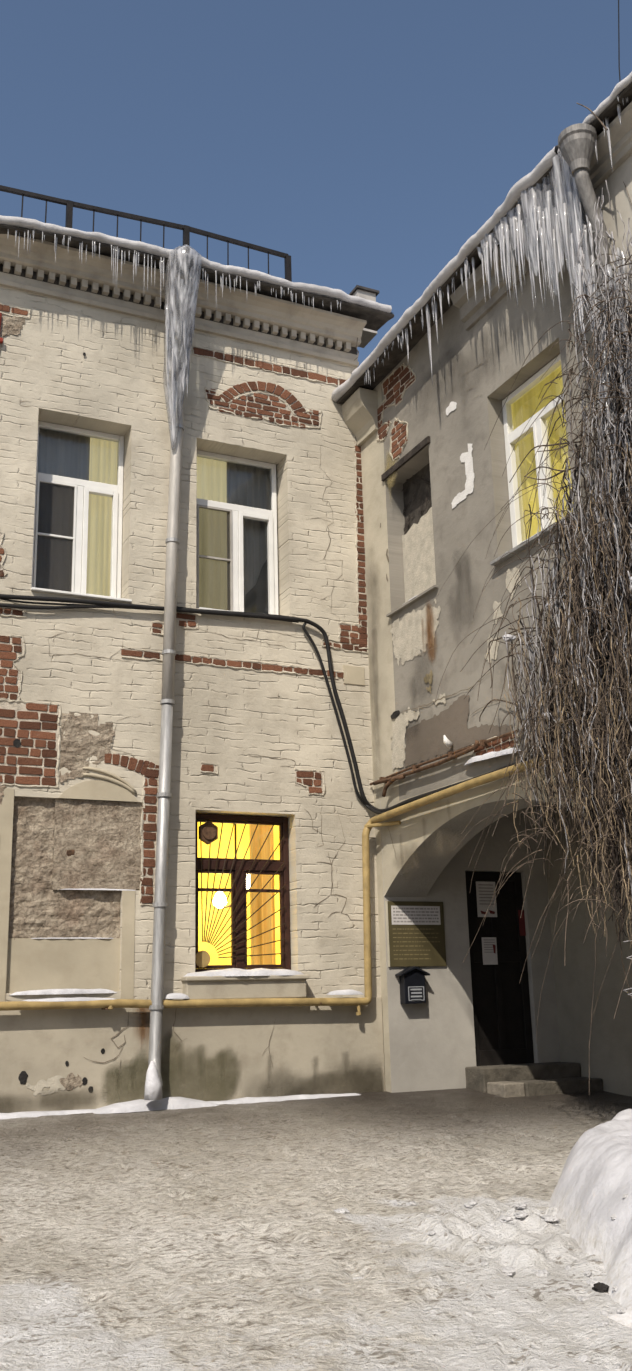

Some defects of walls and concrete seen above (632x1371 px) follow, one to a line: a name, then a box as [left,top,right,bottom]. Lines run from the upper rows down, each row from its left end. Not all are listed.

flaking render [192,346,348,387]
flaking render [204,387,323,430]
flaking render [375,363,416,461]
peeling [451,443,475,509]
flaking render [321,435,369,654]
flaking render [121,612,347,680]
peeling [390,599,441,666]
peeling [390,670,446,769]
flaking render [472,734,521,757]
spalling [0,635,159,940]
water stain [0,1098,17,1113]
water stain [41,1039,236,1109]